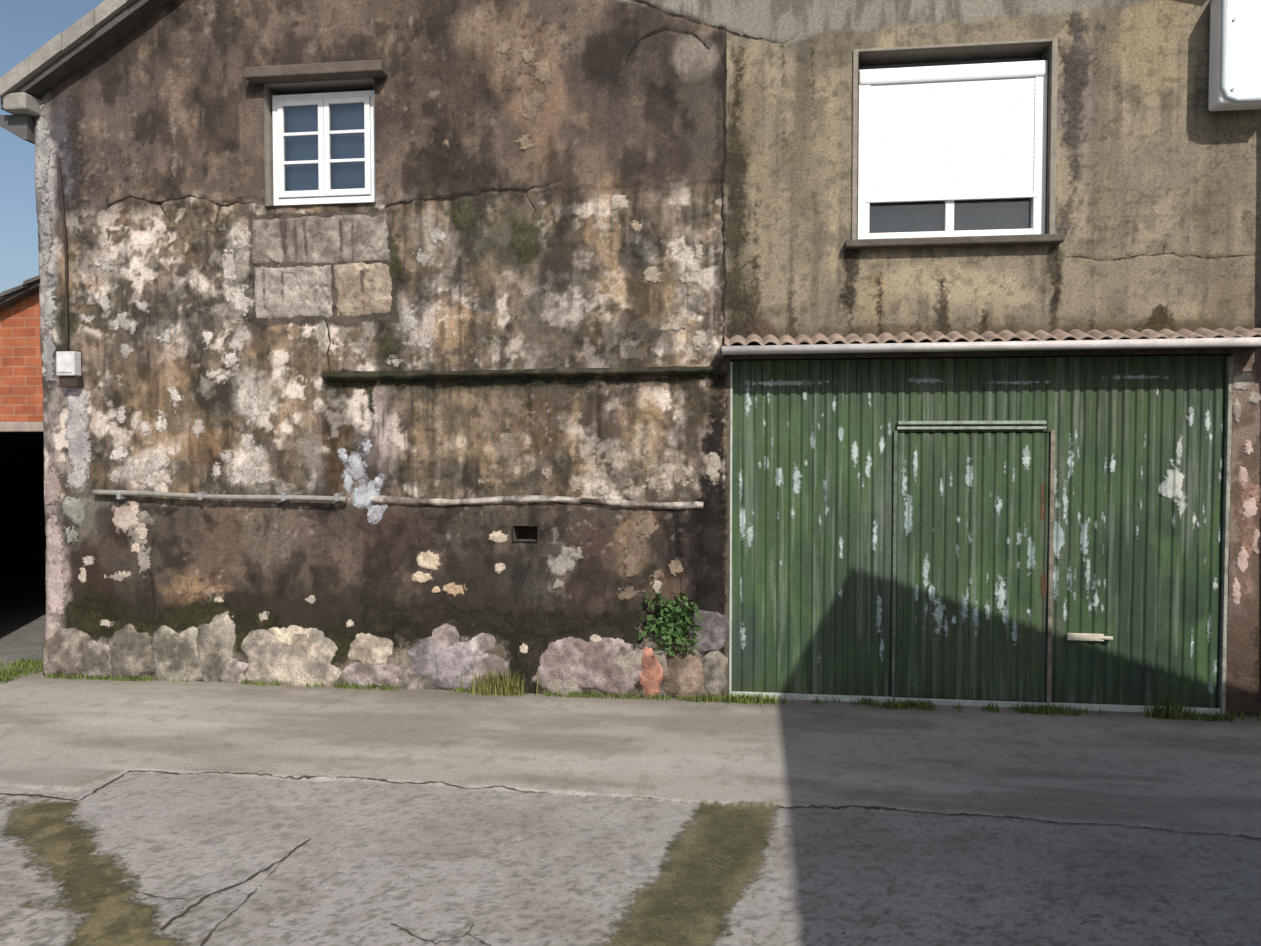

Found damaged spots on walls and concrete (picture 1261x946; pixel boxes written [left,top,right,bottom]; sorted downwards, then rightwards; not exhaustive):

damp [167,70,178,177]
crack [625,0,793,343]
damp [1036,12,1177,351]
spalling [35,101,746,699]
peeling [739,470,755,547]
peeling [759,401,836,494]
peeling [838,423,891,487]
peeling [901,450,918,534]
peeling [914,556,1018,646]
peeling [1053,430,1106,620]
peeling [1158,371,1261,527]
peeling [1213,440,1261,606]